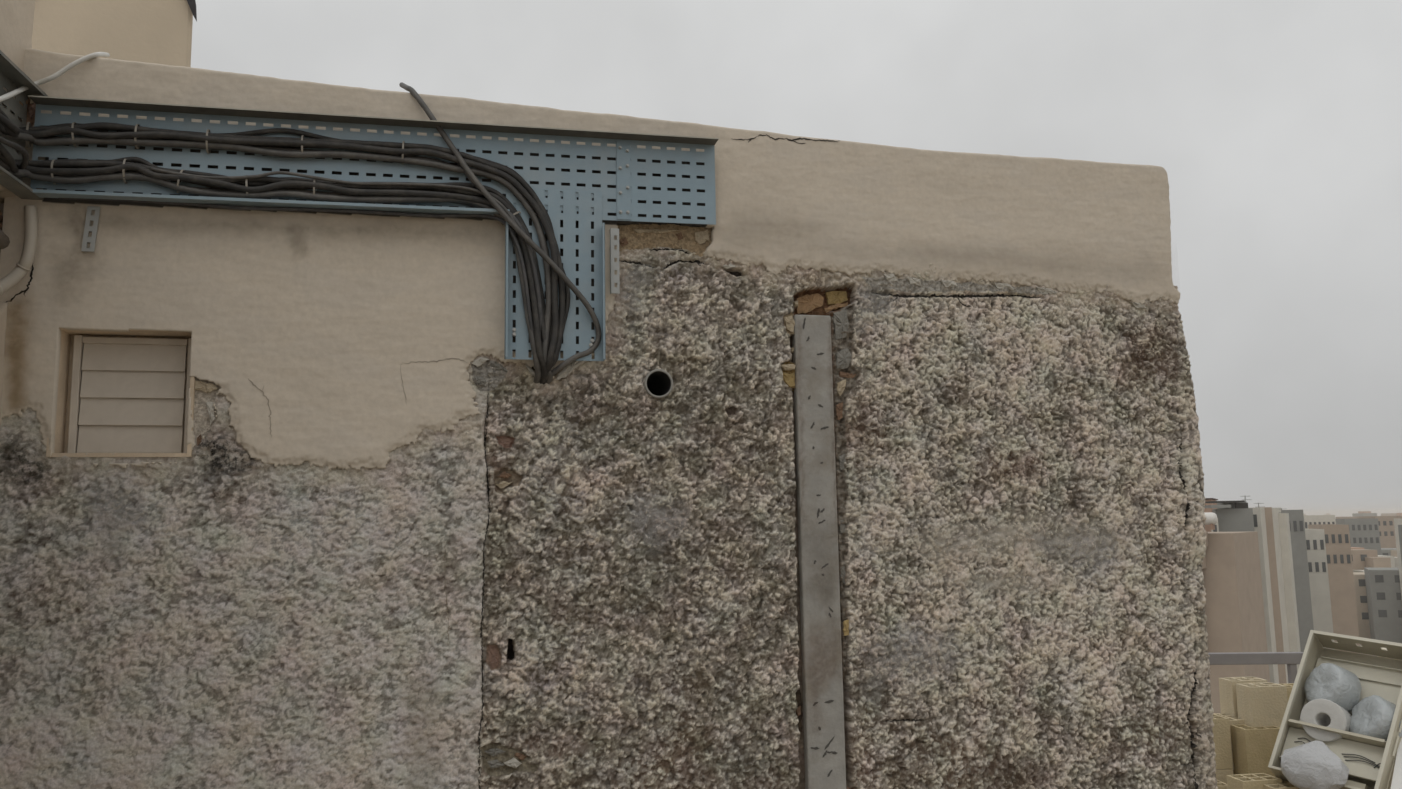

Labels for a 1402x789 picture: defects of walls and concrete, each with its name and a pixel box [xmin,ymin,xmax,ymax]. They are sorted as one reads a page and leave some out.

crack [733,134,840,144]
spalling [617,224,712,257]
crack [872,292,1040,307]
spalling [194,378,221,446]
spalling [494,469,522,494]
spalling [781,286,859,671]
crack [1178,443,1198,524]
crack [1185,669,1201,789]